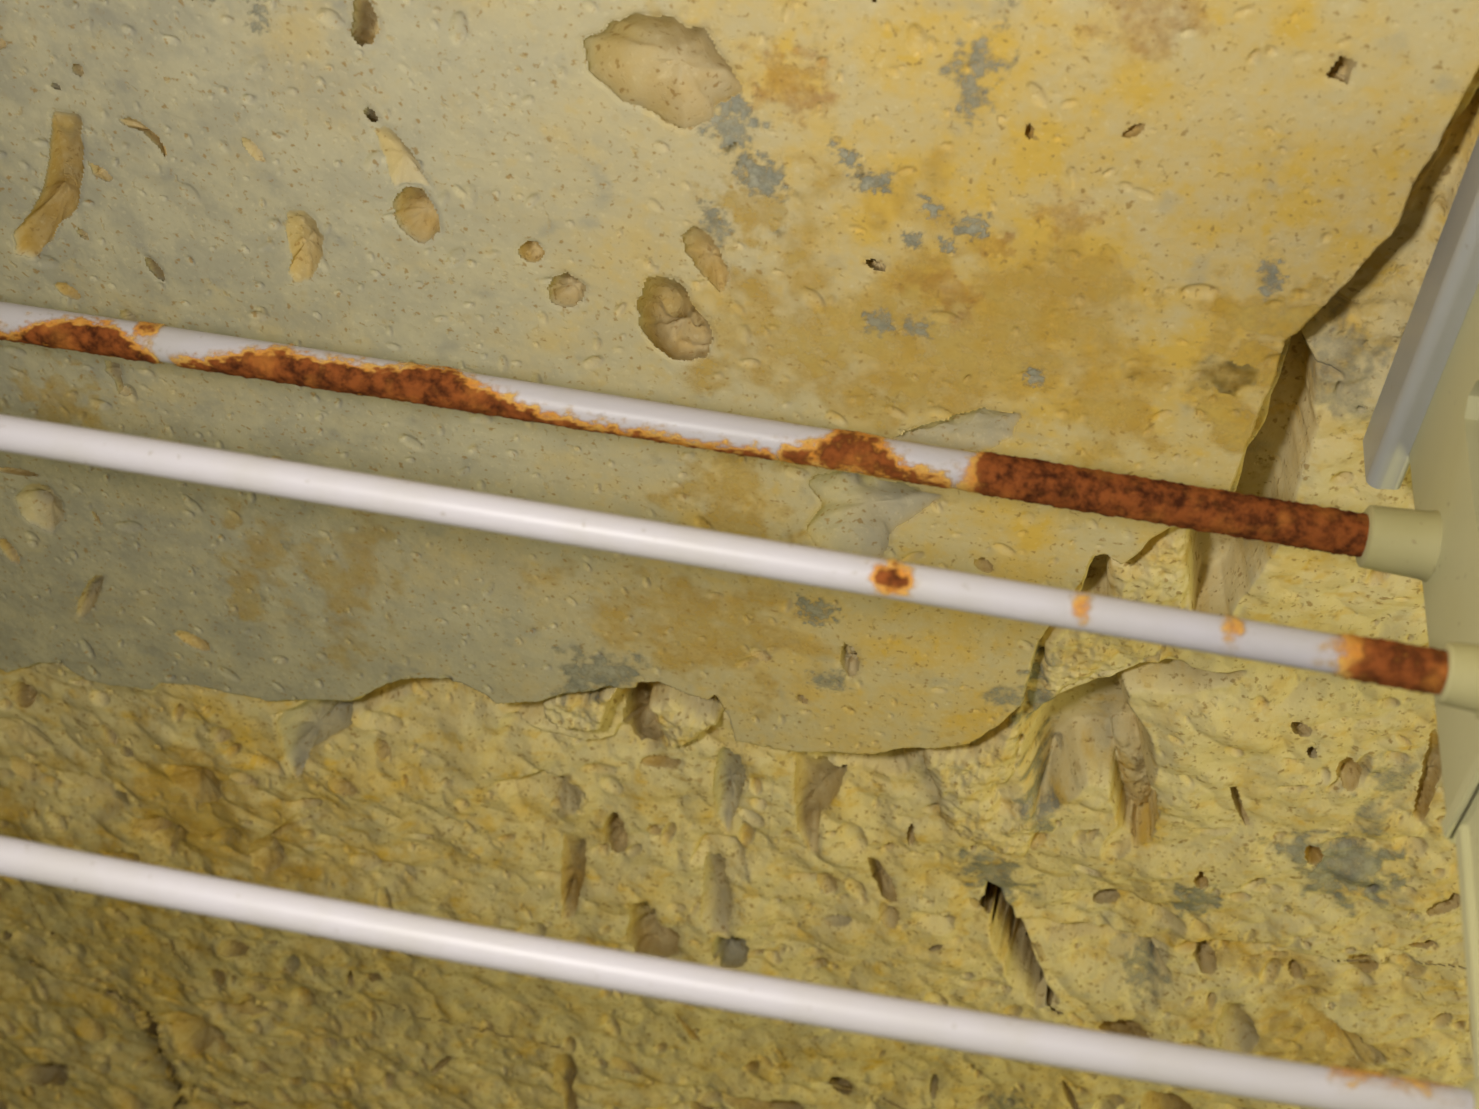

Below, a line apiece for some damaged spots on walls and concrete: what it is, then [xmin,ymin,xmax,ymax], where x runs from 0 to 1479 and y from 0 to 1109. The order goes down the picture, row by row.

spalling [283,205,328,287]
spalling [516,239,589,310]
spalling [632,223,734,365]
spalling [1230,69,1479,513]
corrosion [0,317,1370,557]
spalling [887,405,1028,453]
spalling [800,469,948,559]
corrosion [869,558,914,596]
corrosion [1072,595,1089,623]
spalling [1075,527,1429,647]
corrosion [1333,633,1449,695]
spalling [0,626,1474,1109]